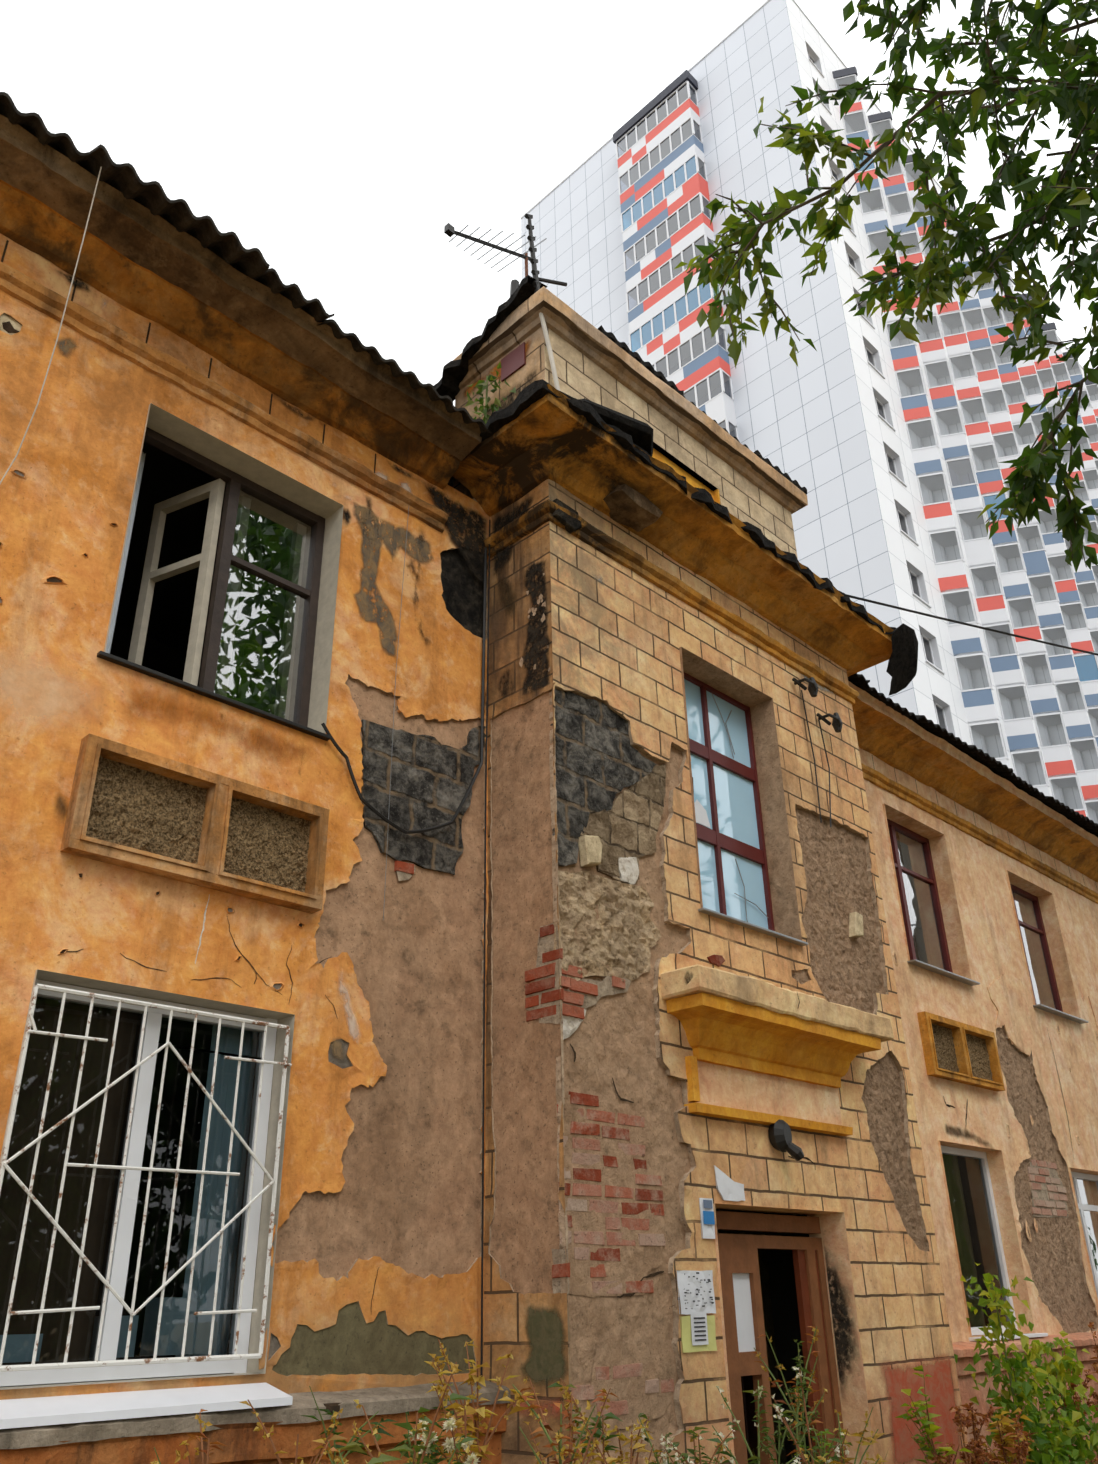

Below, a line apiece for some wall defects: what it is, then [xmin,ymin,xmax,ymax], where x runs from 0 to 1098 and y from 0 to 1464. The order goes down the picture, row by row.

flaking render [432,543,488,643]
peeling [526,590,546,623]
peeling [788,798,898,1015]
flaking render [259,657,725,1464]
flaking render [987,974,1098,1333]